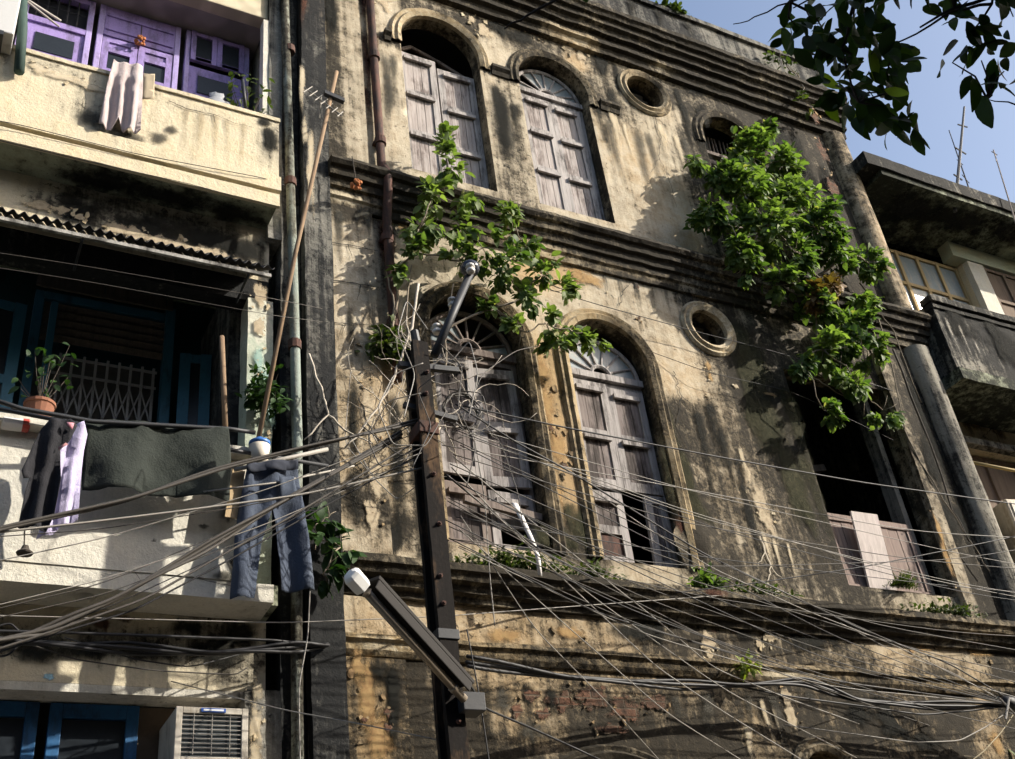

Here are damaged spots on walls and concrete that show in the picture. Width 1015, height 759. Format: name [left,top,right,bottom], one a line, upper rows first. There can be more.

rust [361,0,379,115]
leakage [492,85,521,154]
leakage [302,119,314,194]
peeling [22,200,90,224]
leakage [115,217,172,241]
leakage [58,170,268,226]
peeling [101,220,237,266]
leakage [184,229,262,261]
leakage [658,410,711,524]
leakage [694,399,793,564]
leakage [7,640,107,663]
flaking render [512,681,671,736]